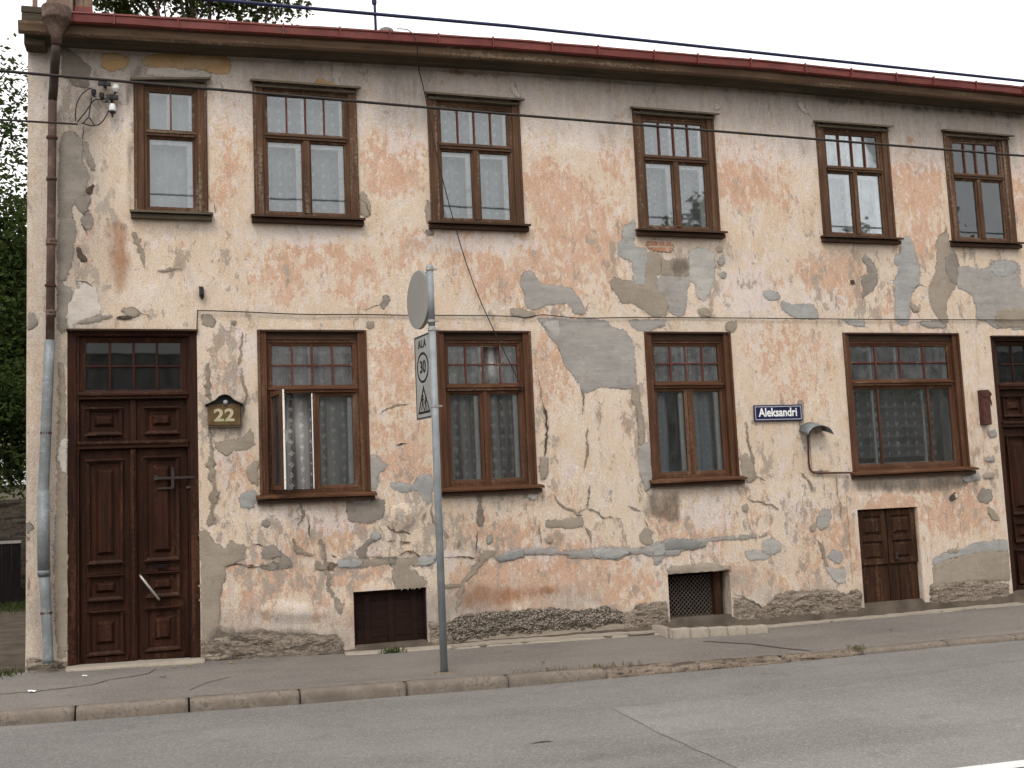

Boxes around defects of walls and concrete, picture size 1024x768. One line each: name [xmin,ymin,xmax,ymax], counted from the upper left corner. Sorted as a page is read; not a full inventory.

spalling [56,127,149,334]
spalling [646,238,674,253]
crack [292,375,778,614]
spalling [639,522,654,546]
spalling [198,527,344,661]
spalling [428,601,669,645]
spalling [733,589,862,621]
spalling [929,548,1010,603]